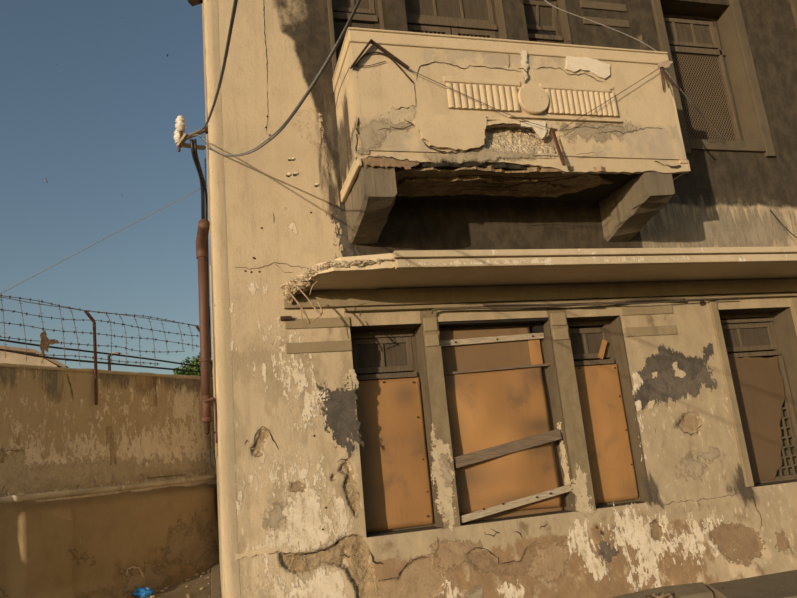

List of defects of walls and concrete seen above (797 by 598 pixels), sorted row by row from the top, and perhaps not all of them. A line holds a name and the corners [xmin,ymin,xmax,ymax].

crack [262,0,270,130]
crack [326,55,517,249]
flaking render [362,148,536,169]
flaking render [486,119,547,139]
spalling [280,257,551,324]
flaking render [0,368,219,500]
flaking render [234,316,766,598]